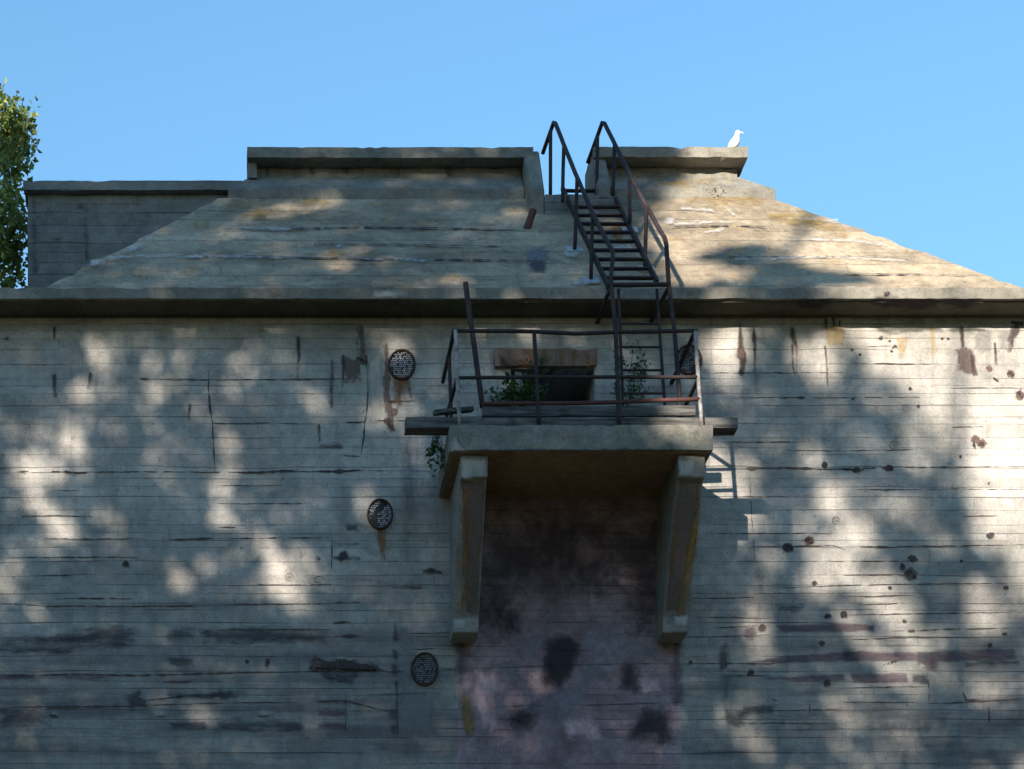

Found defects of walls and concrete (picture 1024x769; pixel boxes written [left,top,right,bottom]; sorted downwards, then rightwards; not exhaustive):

corrosion [737,326,757,378]
corrosion [1008,321,1024,351]
leakage [453,459,486,628]
leakage [456,611,549,735]
leakage [511,622,662,740]
leakage [632,709,669,743]